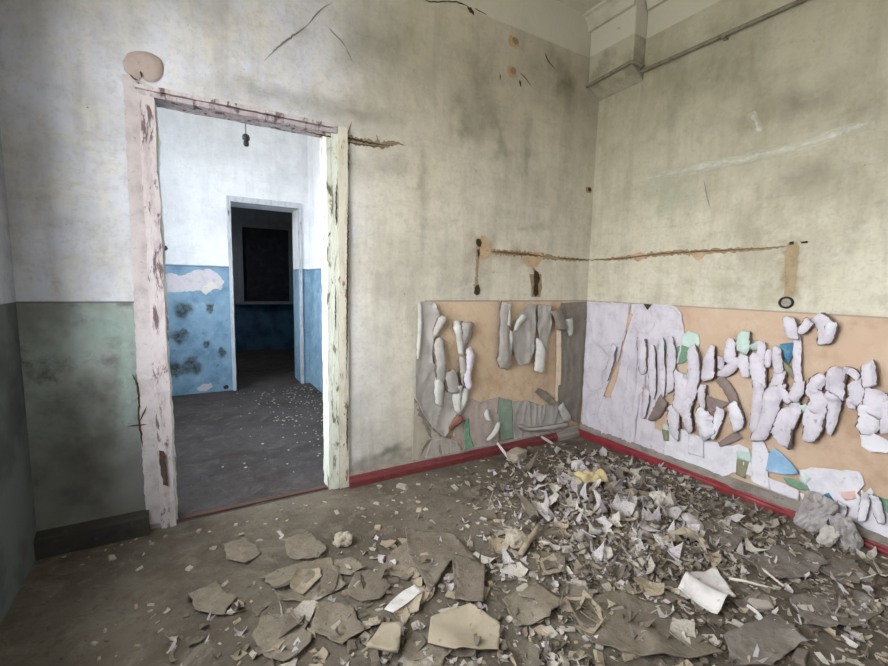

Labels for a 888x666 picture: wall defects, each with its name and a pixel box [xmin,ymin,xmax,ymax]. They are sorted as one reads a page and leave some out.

crack [264,4,353,62]
crack [426,0,487,16]
crack [302,122,405,379]
flaking render [122,51,164,524]
peeling [166,269,224,295]
damp [170,358,200,376]
crack [127,374,147,446]
crack [343,405,351,451]
peeling [411,301,888,538]